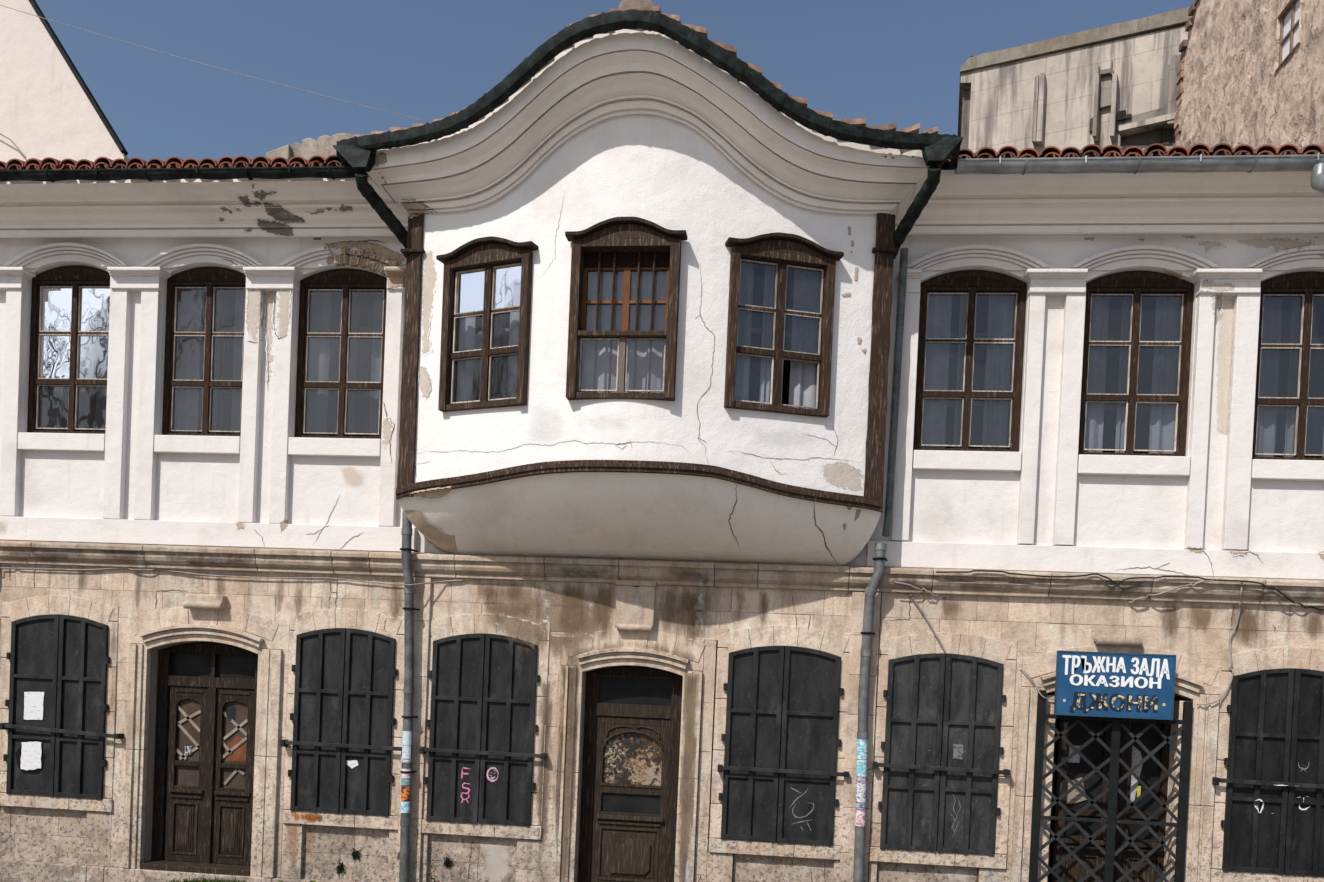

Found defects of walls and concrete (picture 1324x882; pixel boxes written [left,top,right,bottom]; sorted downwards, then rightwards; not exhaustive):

flaking render [219,185,354,236]
flaking render [245,289,291,382]
flaking render [313,238,437,397]
crack [383,269,853,475]
crack [307,498,365,609]
flaking render [404,486,457,553]
crack [813,501,837,563]
peeling [823,461,863,491]
water stain [665,592,707,639]
water stain [1237,609,1257,642]
water stain [462,570,611,882]
water stain [680,675,696,882]